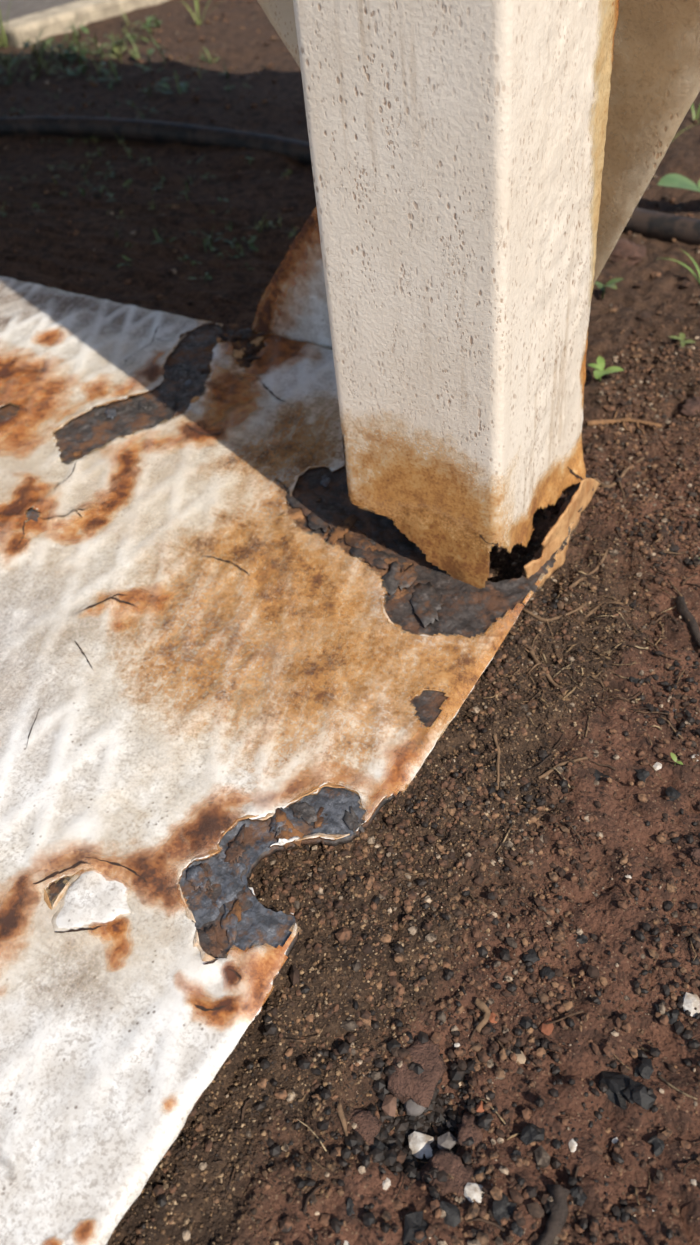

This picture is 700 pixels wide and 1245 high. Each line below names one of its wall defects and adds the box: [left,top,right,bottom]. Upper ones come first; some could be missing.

corrosion [590,0,620,299]
corrosion [0,207,601,957]
spalling [286,466,594,639]
corrosion [91,917,129,969]